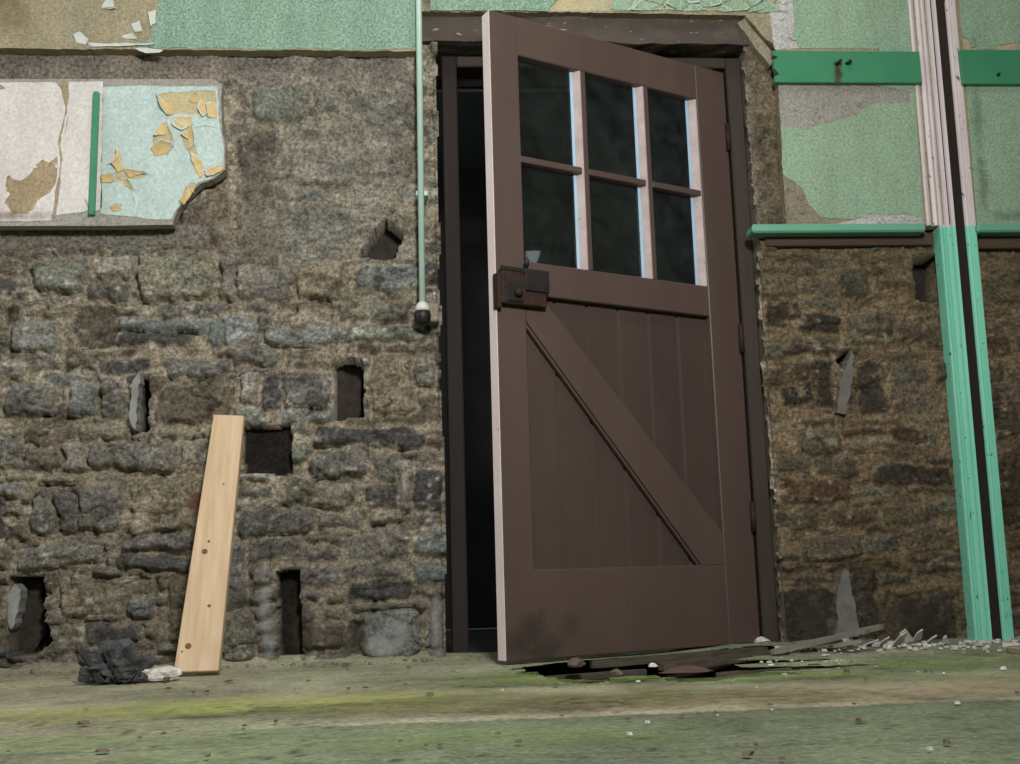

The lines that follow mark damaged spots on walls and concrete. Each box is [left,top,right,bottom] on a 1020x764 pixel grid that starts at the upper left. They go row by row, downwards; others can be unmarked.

peeling [549,0,799,50]
spalling [778,84,911,129]
peeling [4,157,59,214]
spalling [52,200,134,225]
peeling [100,146,150,191]
peeling [151,90,223,205]
spalling [782,176,924,224]